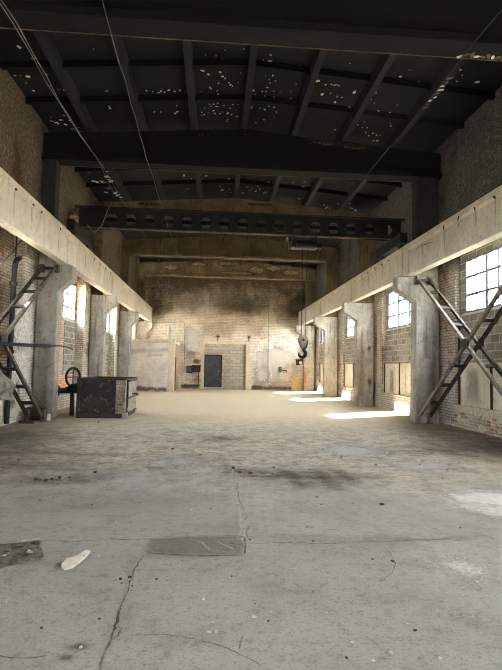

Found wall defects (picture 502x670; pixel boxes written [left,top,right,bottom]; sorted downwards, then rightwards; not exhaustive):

water stain [148,294,164,317]
water stain [219,300,264,312]
crack [99,536,181,670]
crack [144,634,269,670]